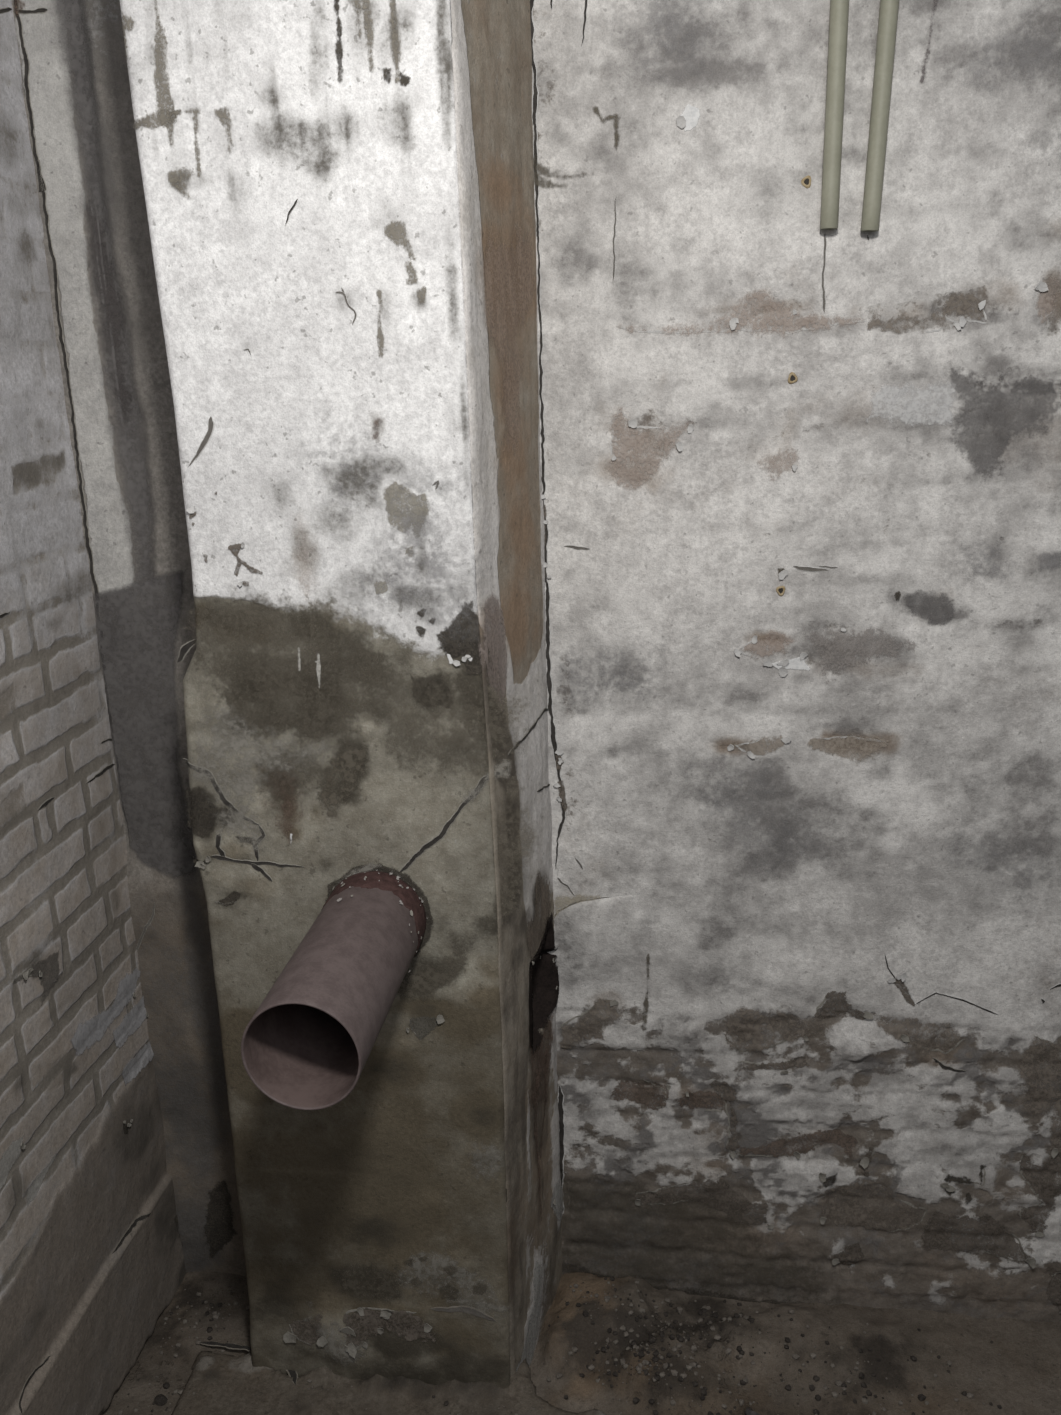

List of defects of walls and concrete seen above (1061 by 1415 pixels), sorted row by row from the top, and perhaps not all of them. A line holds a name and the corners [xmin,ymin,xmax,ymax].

crack [0,0,99,610]
crack [336,288,357,325]
damp [57,0,600,959]
crack [400,0,590,896]
damp [951,368,1057,473]
peeling [447,654,472,666]
crack [182,758,304,881]
spalling [529,913,621,1054]
damp [641,954,650,1030]
peeling [724,955,998,1074]
crack [557,1086,565,1214]
peeling [611,1036,1061,1269]